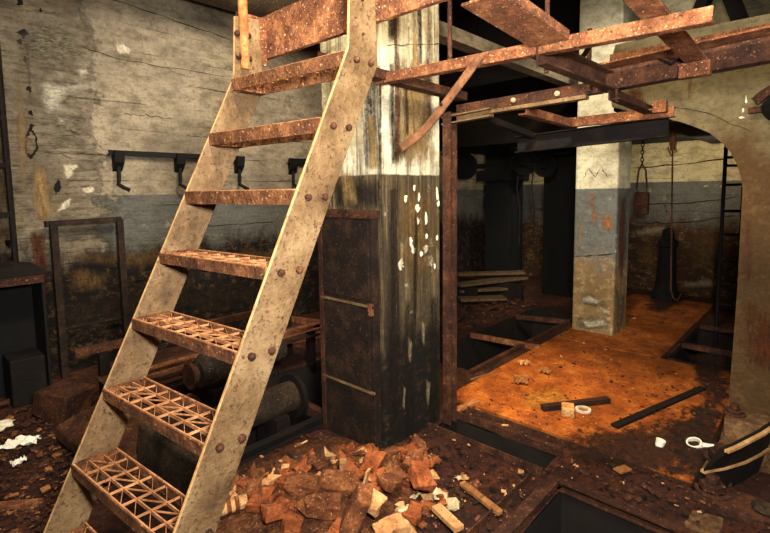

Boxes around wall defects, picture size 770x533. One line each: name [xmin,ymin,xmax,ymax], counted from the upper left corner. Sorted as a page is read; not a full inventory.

crack [85,48,228,77]
crack [114,0,230,40]
leakage [408,10,422,63]
peeling [63,165,78,179]
leakage [335,81,438,436]
peeling [404,185,438,256]
corrosion [592,197,626,281]